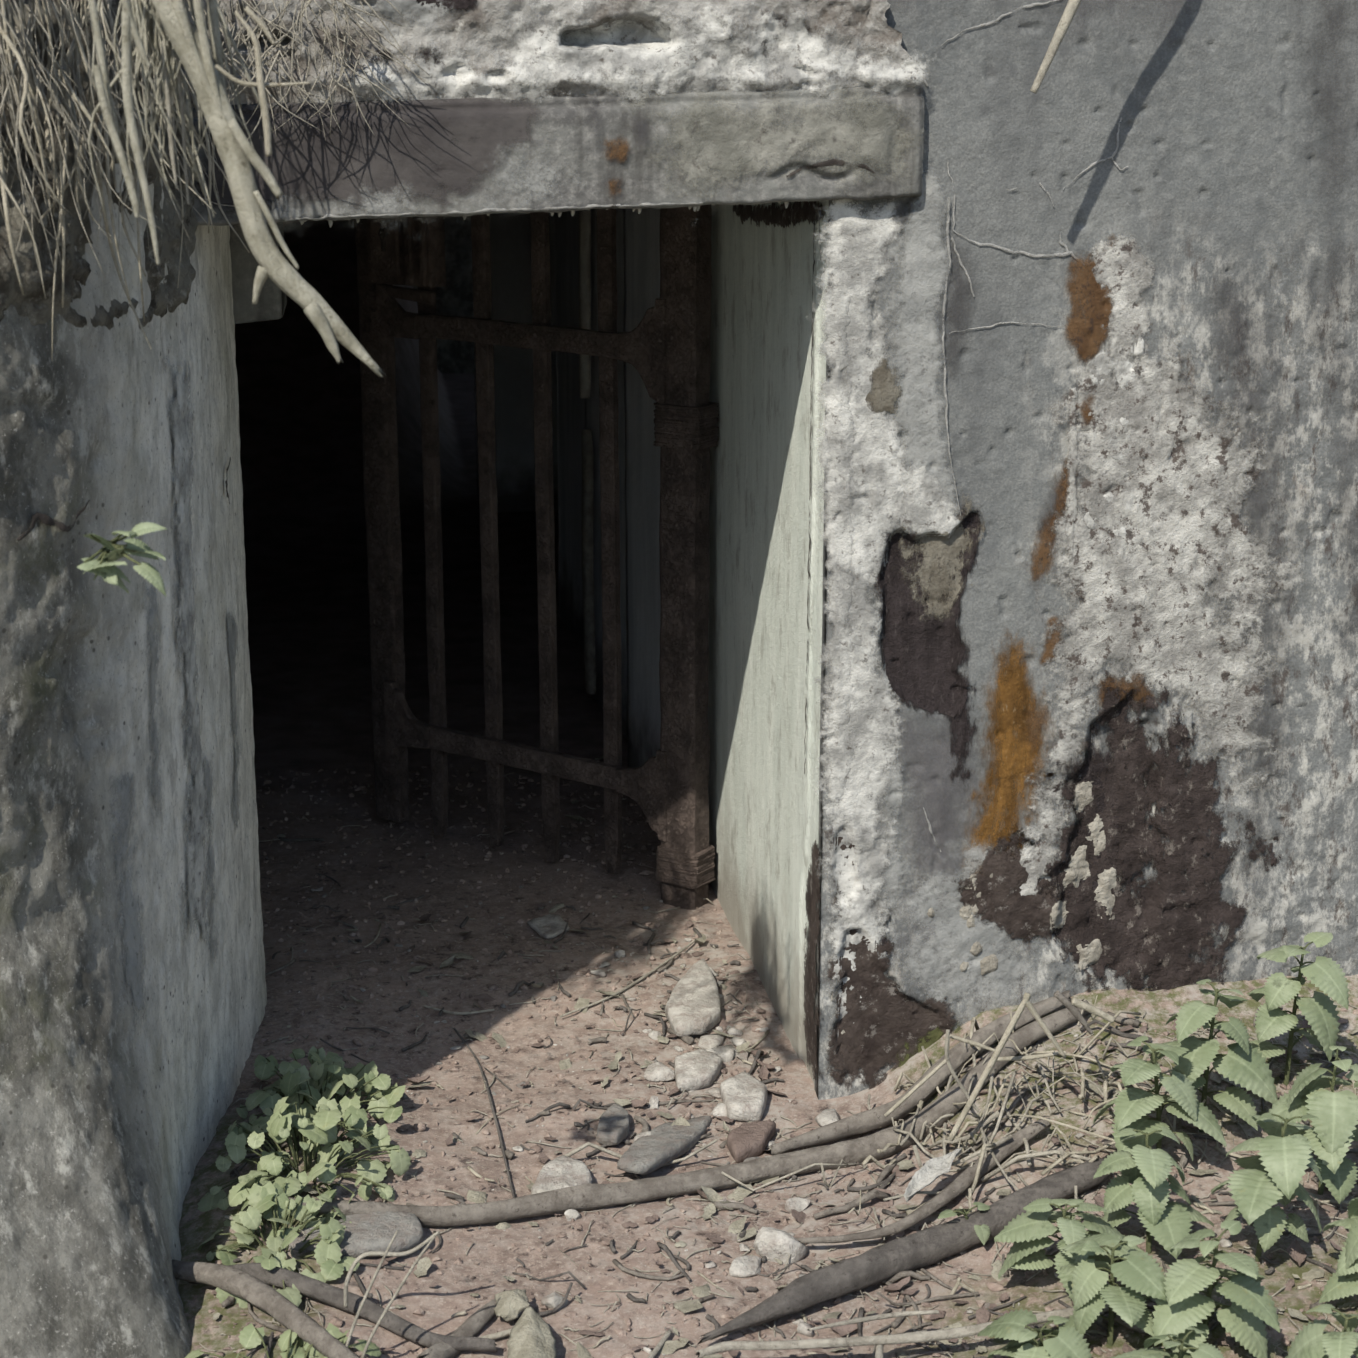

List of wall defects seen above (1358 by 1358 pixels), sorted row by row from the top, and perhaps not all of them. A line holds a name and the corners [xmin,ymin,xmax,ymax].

water stain [197,127,236,215]
water stain [231,0,926,226]
crack [786,159,875,177]
crack [947,117,1128,334]
corrosion [1066,237,1117,361]
water stain [815,175,1041,1030]
spalling [870,497,986,719]
corrosion [1031,460,1077,580]
water stain [1017,235,1301,896]
corrosion [966,617,1064,874]
spalling [955,670,1283,992]
spalling [803,826,958,1090]